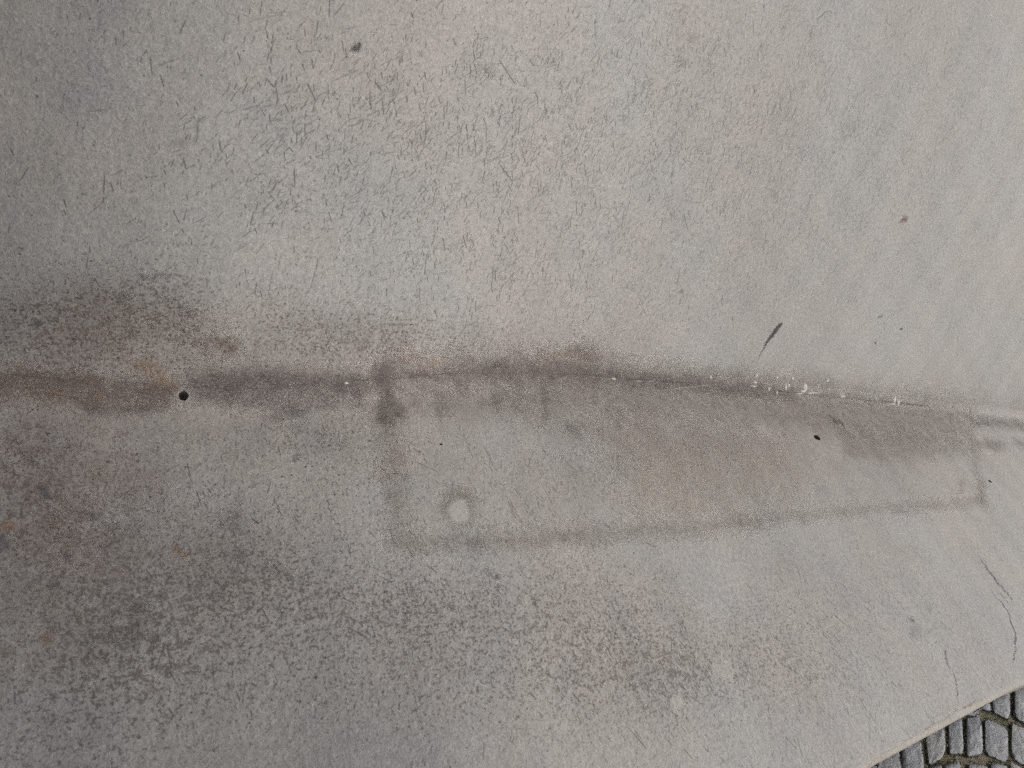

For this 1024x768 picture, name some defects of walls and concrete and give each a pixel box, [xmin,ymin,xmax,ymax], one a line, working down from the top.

leakage [0,370,173,416]
leakage [190,360,1024,458]
crack [979,557,1017,660]